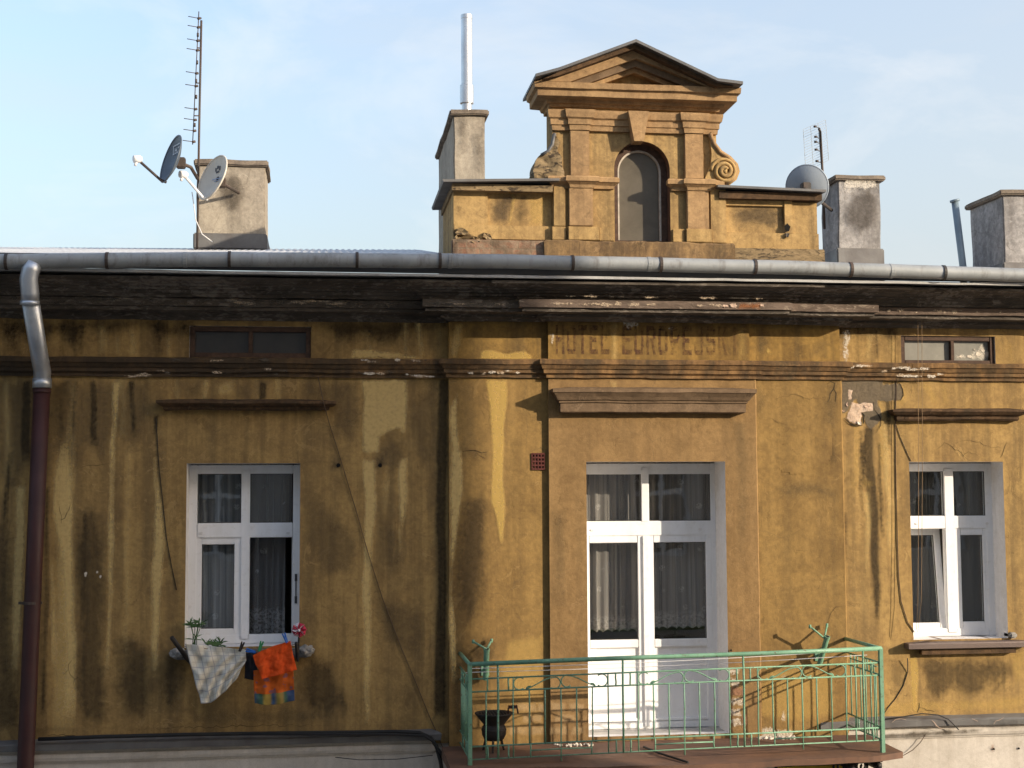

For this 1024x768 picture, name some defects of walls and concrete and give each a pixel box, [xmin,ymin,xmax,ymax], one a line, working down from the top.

leakage [45,443,113,716]
leakage [123,495,163,709]
leakage [363,380,406,686]
leakage [435,380,482,718]
leakage [488,381,506,534]
flaking render [842,389,873,427]
leakage [861,401,890,615]
leakage [911,658,1006,707]